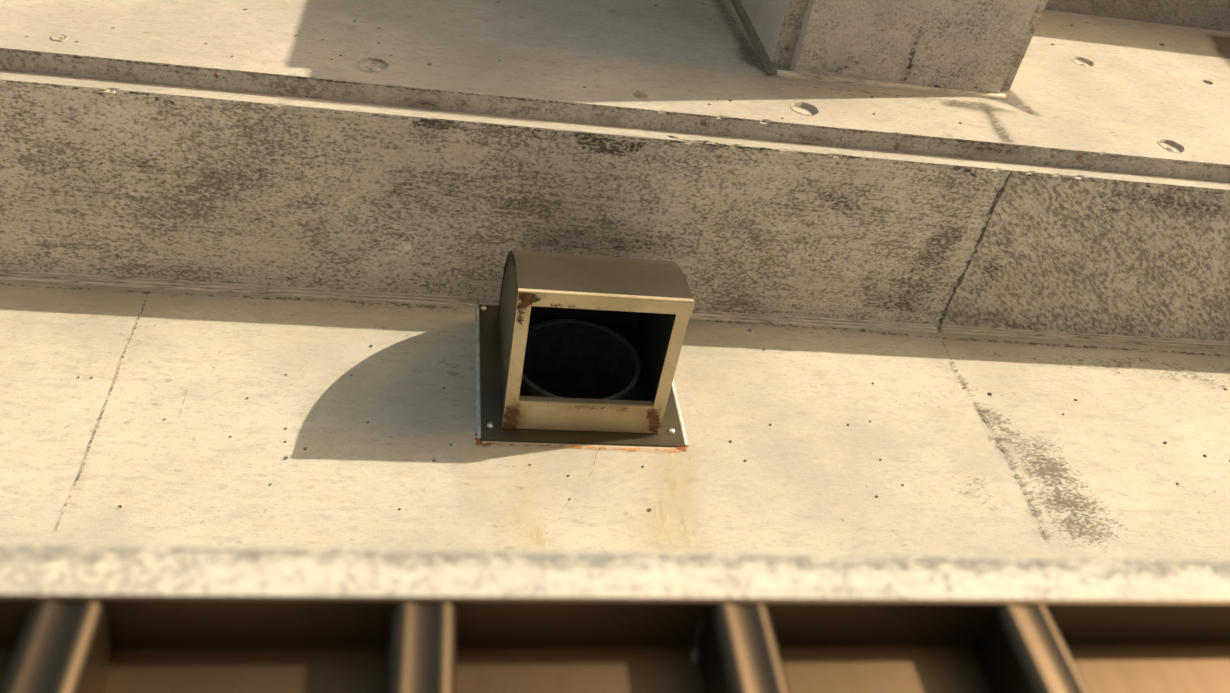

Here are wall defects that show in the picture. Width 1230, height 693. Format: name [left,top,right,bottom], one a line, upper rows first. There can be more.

crack [56,293,148,530]
leakage [172,361,1230,575]
crack [940,171,1047,539]